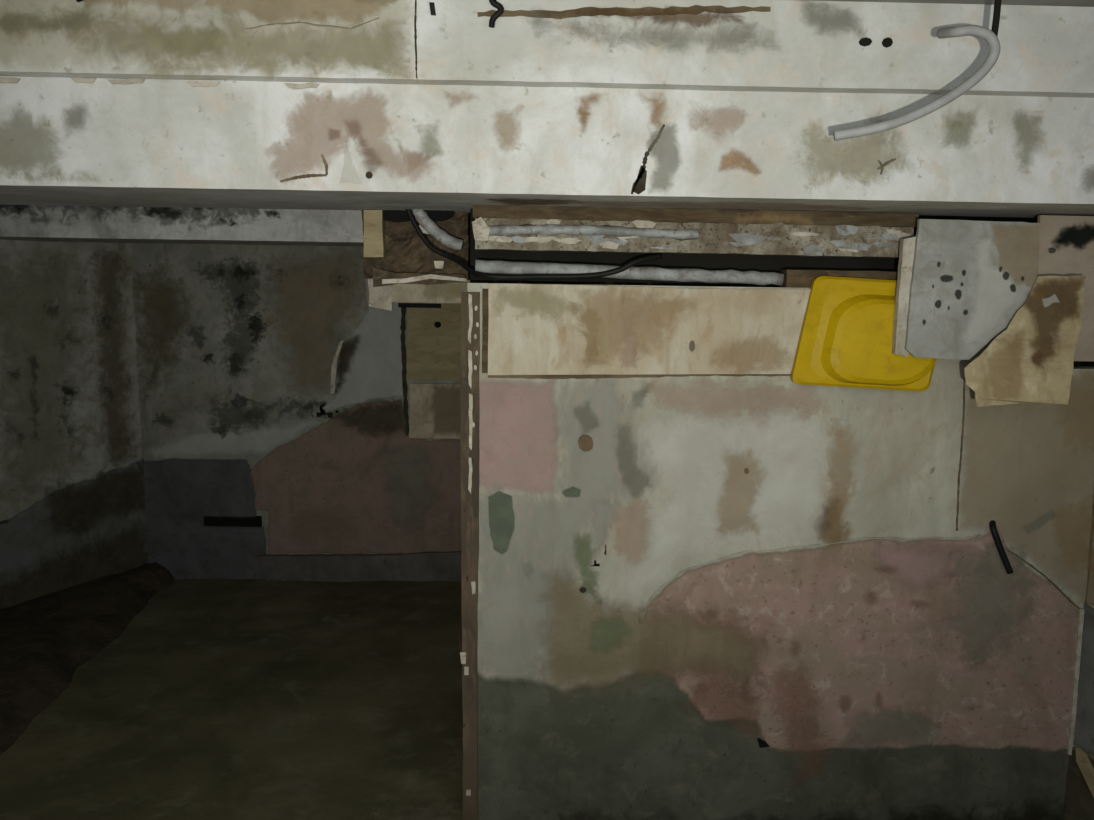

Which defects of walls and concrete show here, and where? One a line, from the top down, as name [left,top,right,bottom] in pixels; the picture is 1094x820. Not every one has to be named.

mould [148,207,180,219]
peeling [713,222,916,256]
spalling [323,210,676,493]
peeling [151,422,316,458]
spalling [204,516,262,527]
peeling [471,382,1094,752]
peeling [460,652,469,675]
damp [477,671,1094,820]